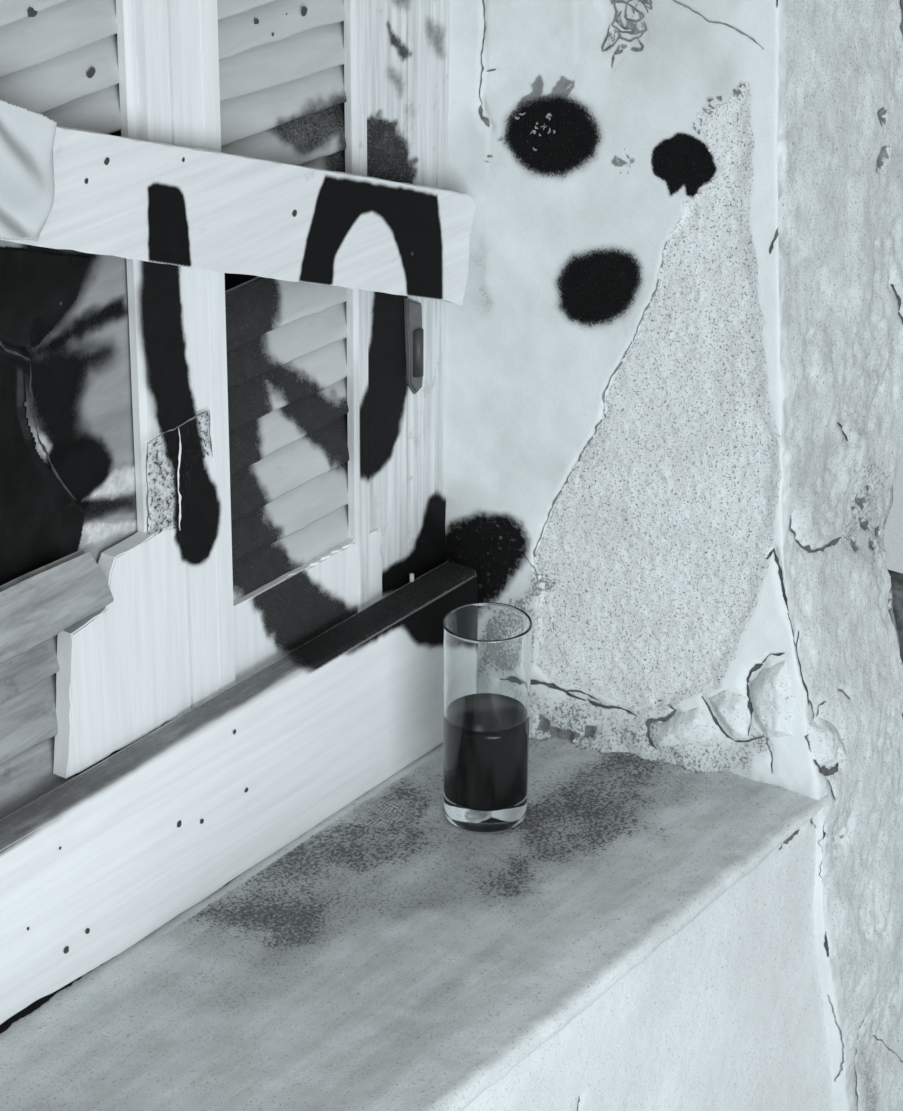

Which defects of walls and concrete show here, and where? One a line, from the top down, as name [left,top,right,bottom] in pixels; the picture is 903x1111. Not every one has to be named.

crack [673,0,764,50]
crack [769,229,779,254]
spalling [534,82,782,713]
crack [526,242,667,656]
leakage [501,565,555,663]
crack [702,517,851,801]
spalling [537,715,597,741]
crack [530,680,677,750]
leakage [168,691,770,1012]
crack [779,826,826,882]
crack [822,933,830,957]
crack [827,995,903,1109]